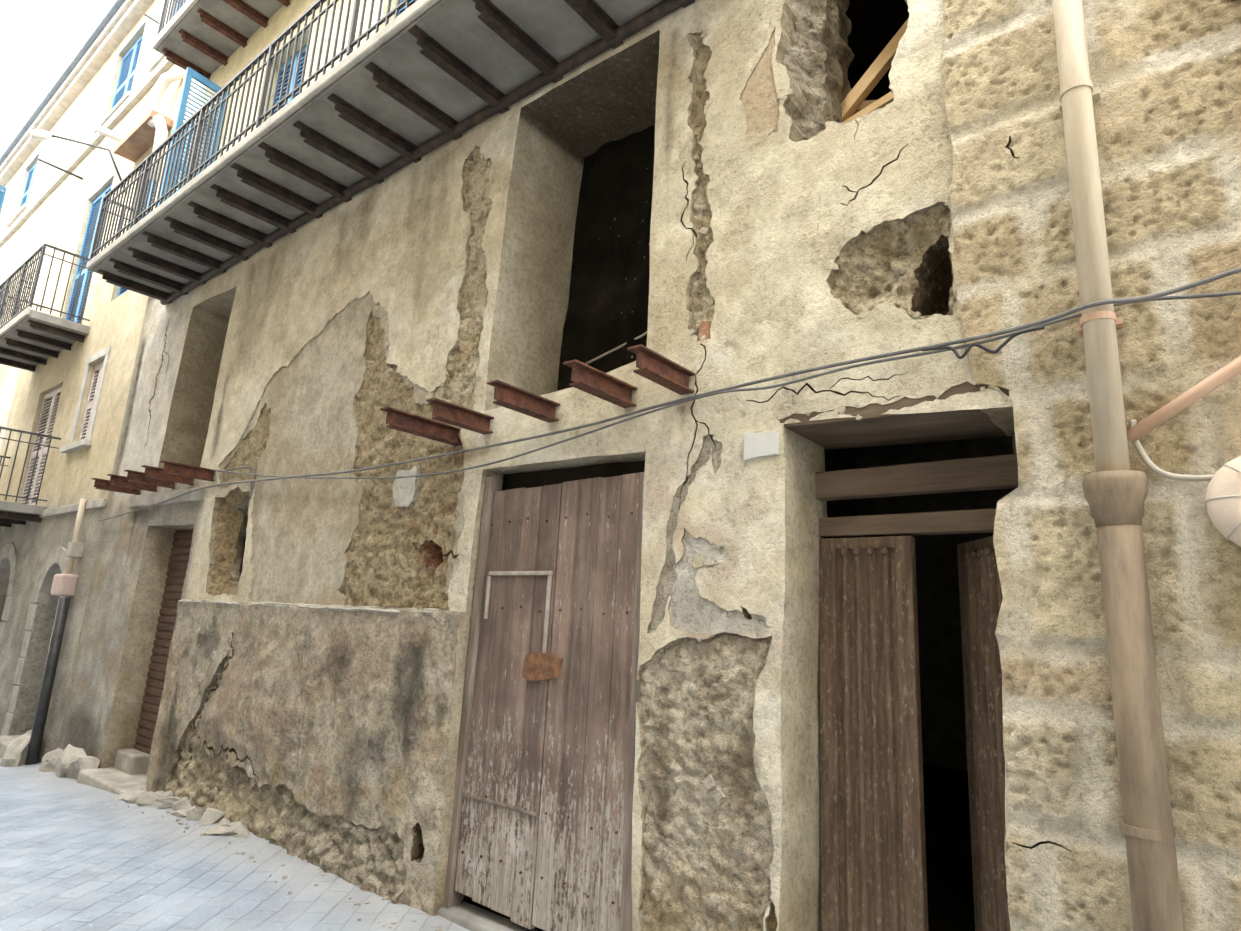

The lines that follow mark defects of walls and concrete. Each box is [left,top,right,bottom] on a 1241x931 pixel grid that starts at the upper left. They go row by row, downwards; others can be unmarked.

spalling [739,0,855,142]
crack [680,161,697,262]
flaking render [686,28,715,342]
crack [840,144,908,206]
flaking render [826,201,957,329]
flaking render [206,145,492,611]
crack [679,344,716,510]
crack [746,373,907,403]
crack [179,632,258,784]
flaking render [164,650,425,904]
flaking render [636,434,778,931]